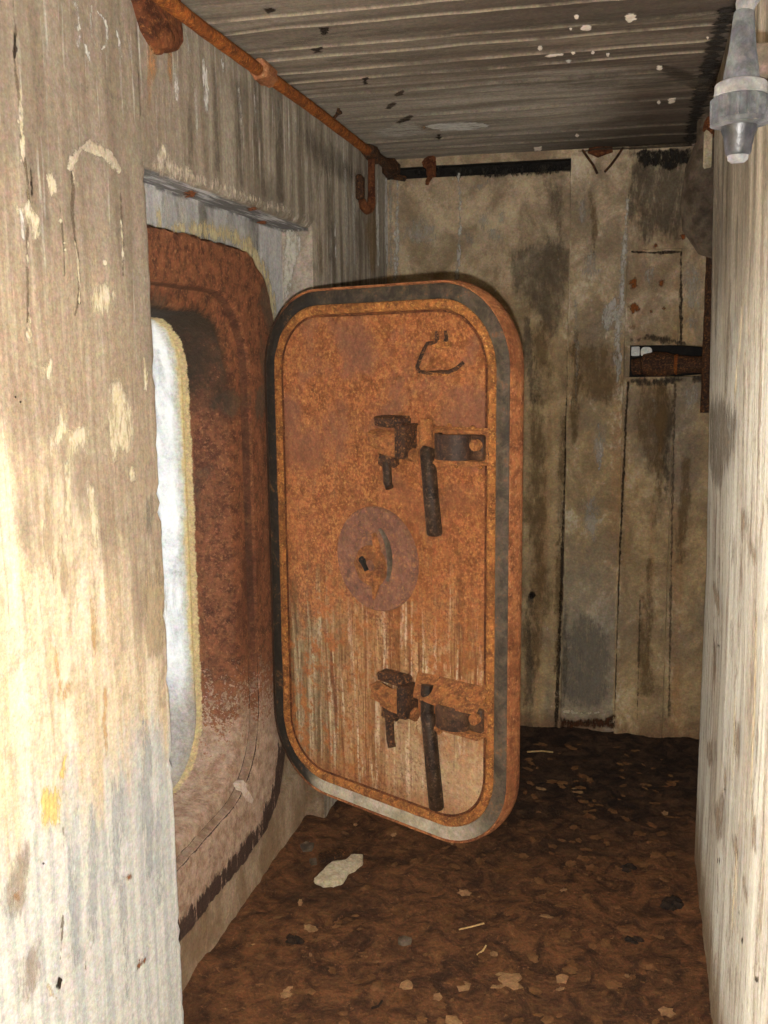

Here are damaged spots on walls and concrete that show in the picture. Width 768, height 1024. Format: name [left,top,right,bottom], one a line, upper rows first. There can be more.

damp [525,425,563,623]